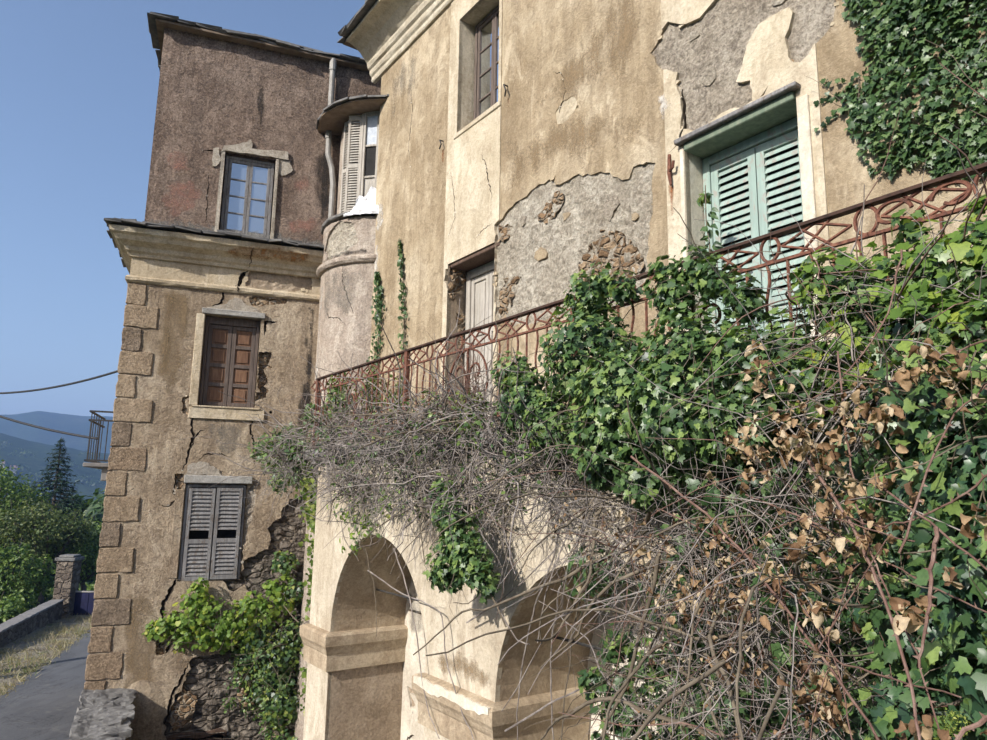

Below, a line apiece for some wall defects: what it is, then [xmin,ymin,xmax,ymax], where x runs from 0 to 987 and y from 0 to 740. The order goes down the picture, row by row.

spalling [652,0,839,131]
crack [206,247,254,308]
spalling [493,161,655,327]
spalling [255,352,272,401]
crack [162,418,255,507]
crack [157,578,177,618]
spalling [163,486,306,740]
crack [159,641,188,725]